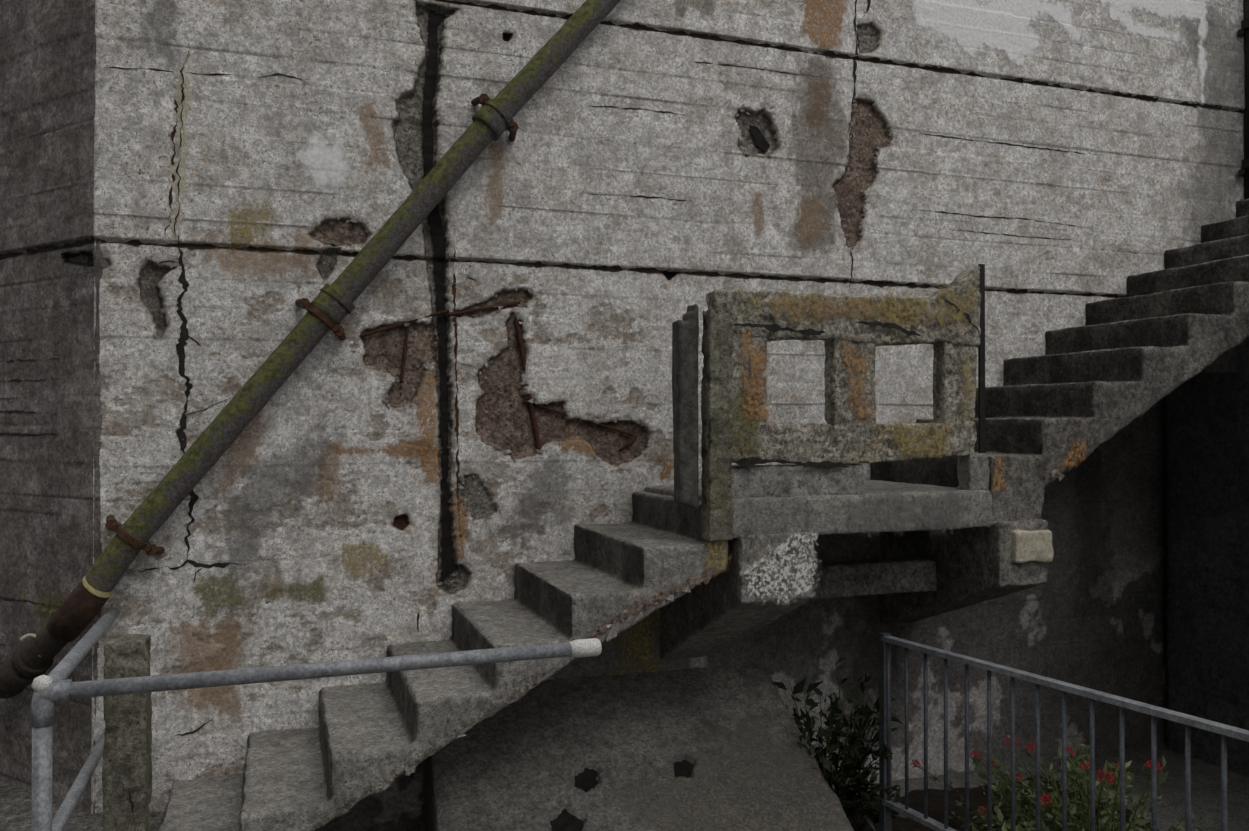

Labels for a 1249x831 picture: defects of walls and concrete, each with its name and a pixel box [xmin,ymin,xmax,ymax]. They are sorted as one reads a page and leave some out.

crack [107,51,302,454]
spalling [310,216,370,279]
crack [392,2,476,585]
crack [689,61,821,78]
spalling [735,109,780,157]
corrosion [803,0,847,51]
crack [816,0,871,188]
spalling [833,99,893,250]
spalling [358,288,650,466]
crack [140,490,248,583]